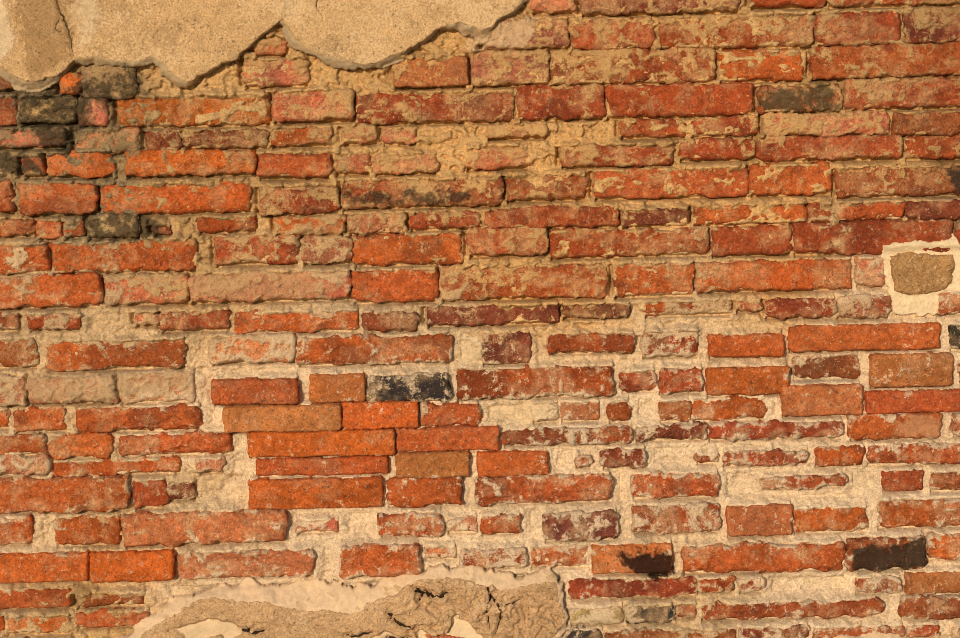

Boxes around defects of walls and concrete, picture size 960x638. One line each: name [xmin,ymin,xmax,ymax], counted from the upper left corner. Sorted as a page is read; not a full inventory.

crack [55,0,74,56]
flaking render [0,0,527,93]
crack [241,627,265,635]
flaking render [118,563,569,638]
crack [346,613,412,638]
crack [413,588,451,601]
crack [486,587,520,634]